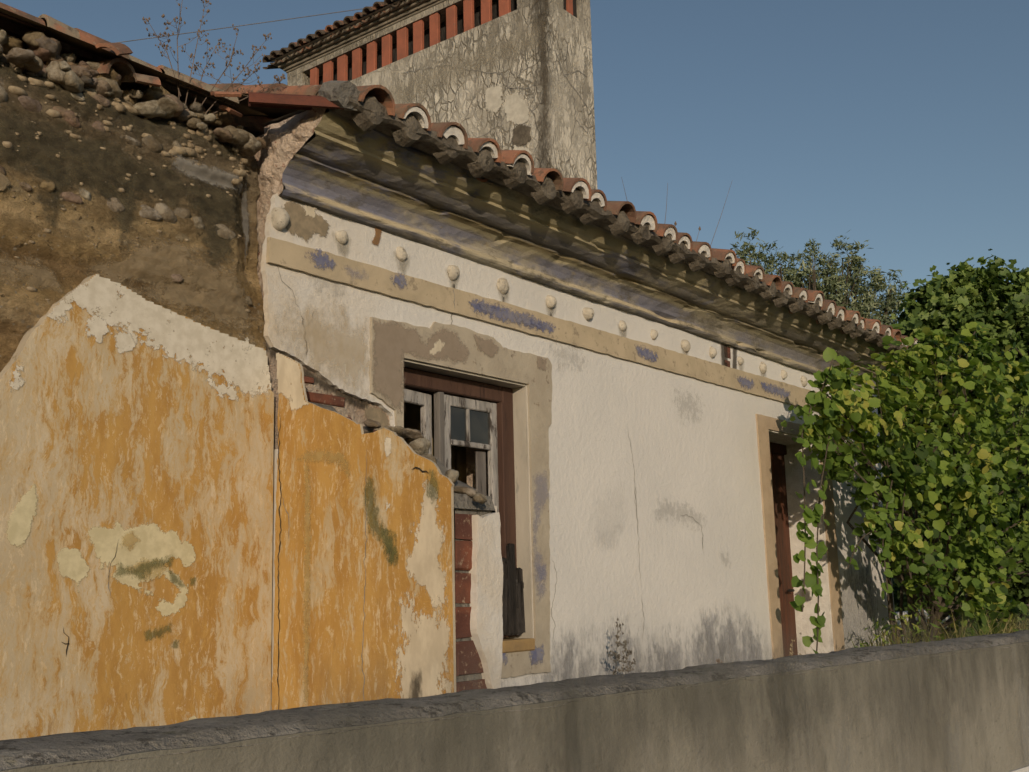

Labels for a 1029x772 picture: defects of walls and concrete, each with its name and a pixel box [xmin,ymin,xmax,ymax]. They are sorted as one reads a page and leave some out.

crack [405,39,592,155]
peeling [0,240,498,457]
peeling [6,484,38,548]
peeling [57,521,196,617]
peeling [391,479,452,698]